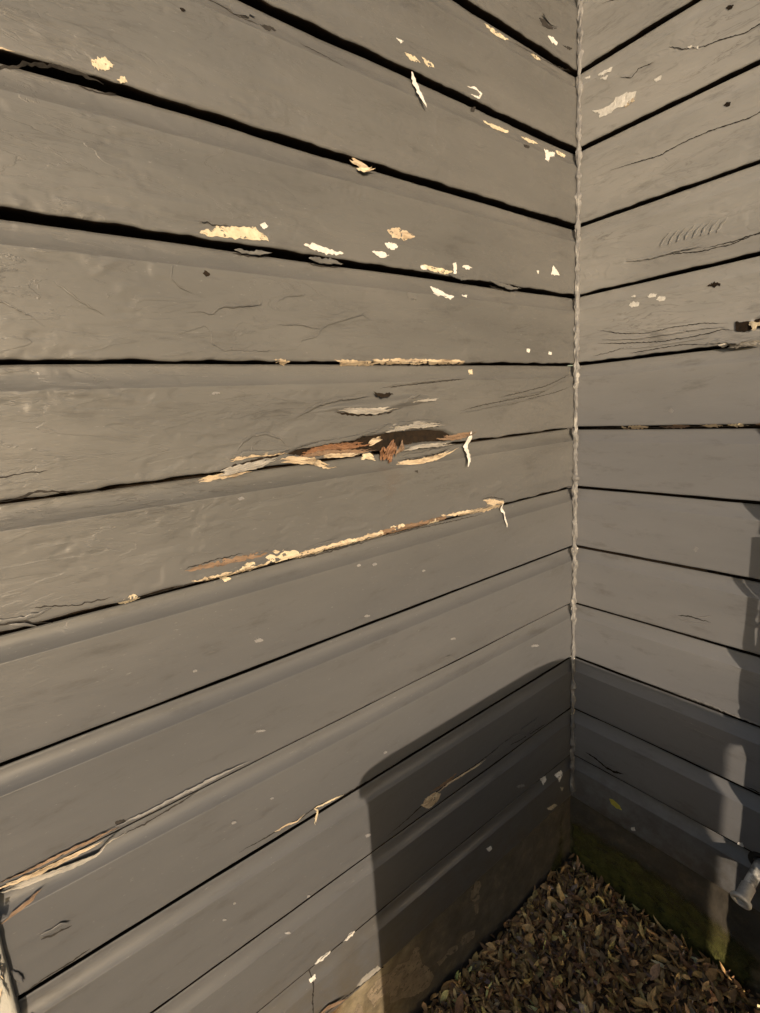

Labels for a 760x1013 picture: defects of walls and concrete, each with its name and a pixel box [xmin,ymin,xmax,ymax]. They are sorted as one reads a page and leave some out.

crack [209,0,276,31]
crack [670,23,760,50]
crack [0,47,116,95]
peeling [91,56,128,84]
peeling [396,38,434,107]
crack [613,112,760,170]
peeling [200,217,271,258]
peeling [372,227,415,258]
crack [627,217,760,262]
peeling [420,262,472,281]
spalling [330,430,449,451]
peeling [116,497,507,605]